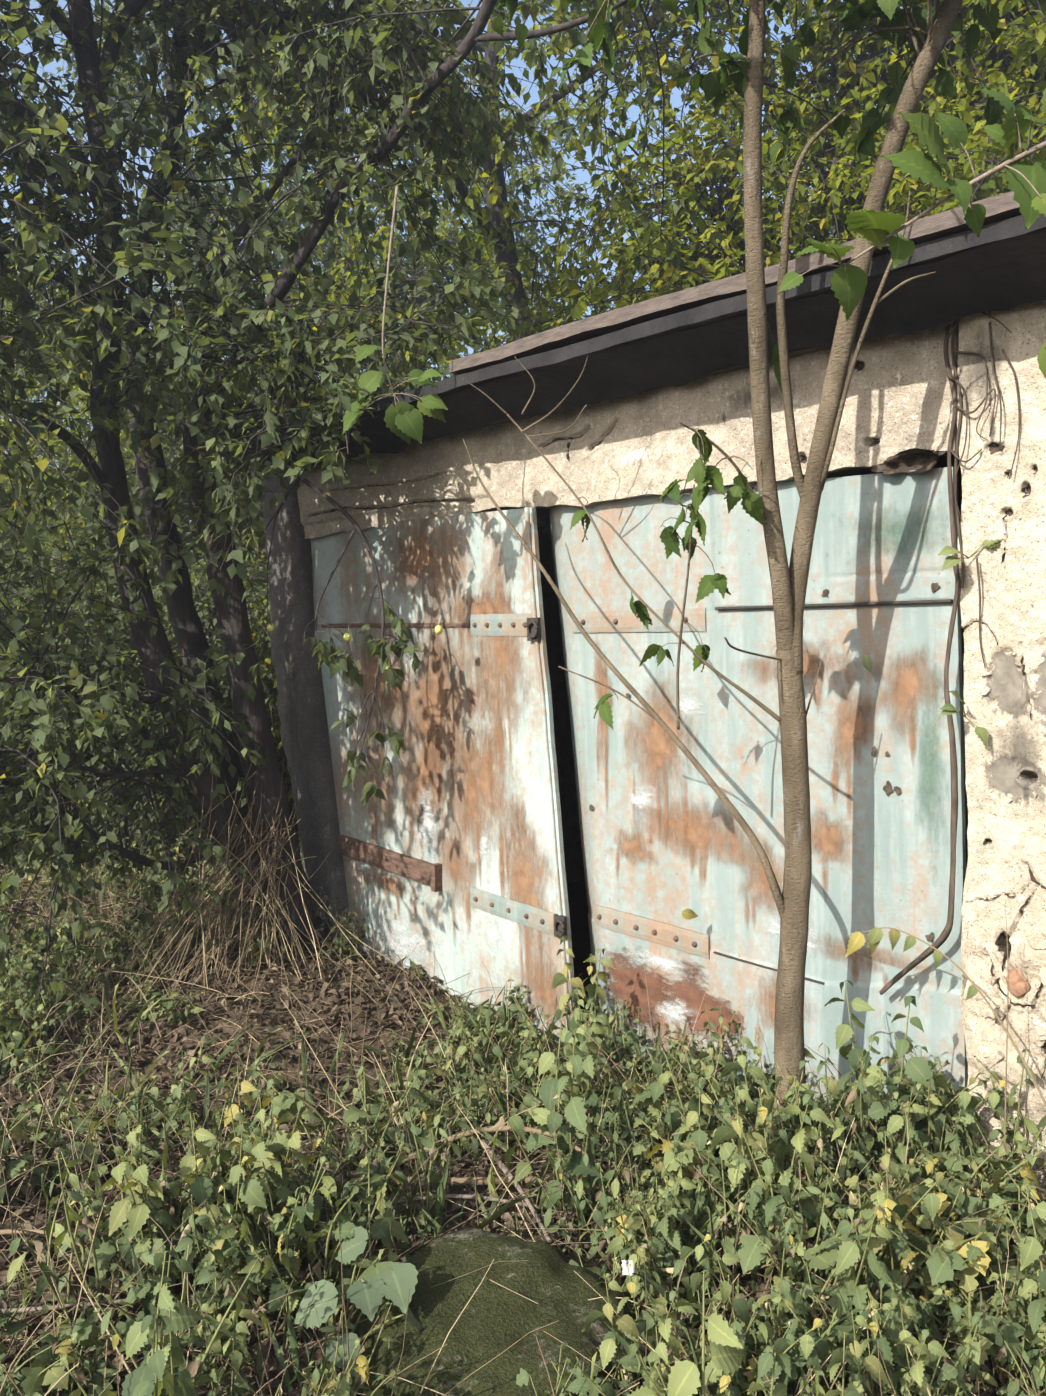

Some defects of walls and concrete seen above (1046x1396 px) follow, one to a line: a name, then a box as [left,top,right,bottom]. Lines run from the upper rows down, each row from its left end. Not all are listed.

spalling [869,438,946,474]
corrosion [596,657,612,793]
corrosion [803,649,827,705]
corrosion [832,654,926,802]
flaking render [980,651,1046,737]
corrosion [628,684,784,921]
flaking render [985,751,1046,803]
corrosion [616,834,651,871]
corrosion [811,817,843,886]
spalling [995,931,1011,958]
crack [966,864,1046,1024]
corrosion [601,948,776,1053]